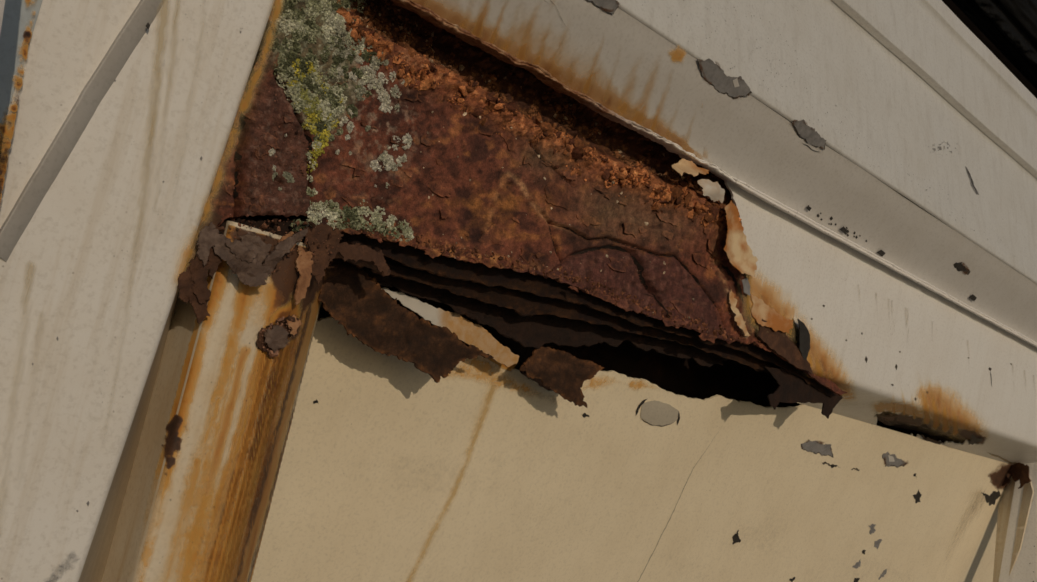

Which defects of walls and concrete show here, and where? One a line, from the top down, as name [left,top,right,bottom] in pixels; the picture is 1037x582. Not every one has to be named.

peeling [587,0,619,14]
peeling [697,59,752,99]
rust [0,0,35,203]
peeling [793,119,826,152]
peeling [671,159,794,336]
rust [155,0,852,582]
peeling [636,399,680,427]
rust [876,387,986,445]
peeling [801,440,837,468]
peeling [882,452,922,503]
rust [990,463,1031,489]